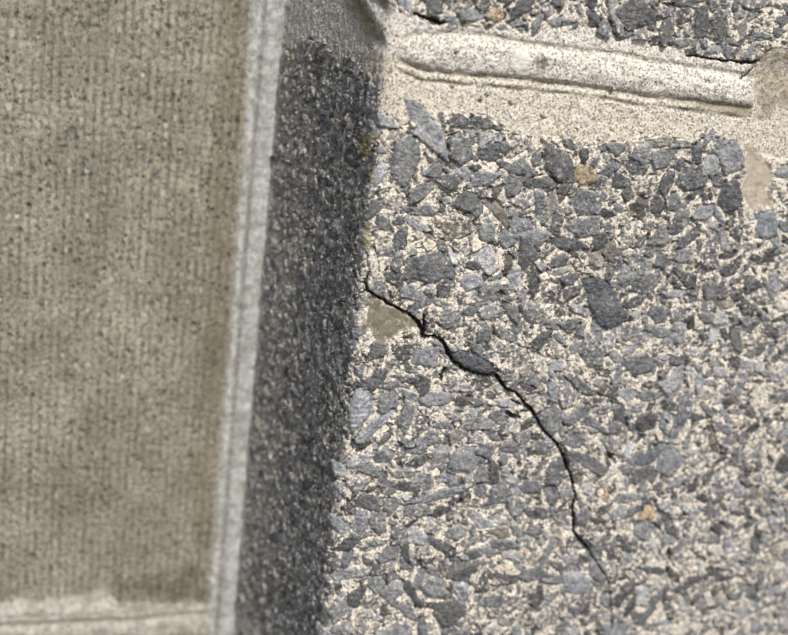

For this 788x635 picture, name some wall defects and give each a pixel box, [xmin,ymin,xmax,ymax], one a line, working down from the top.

crack [364,275,614,628]